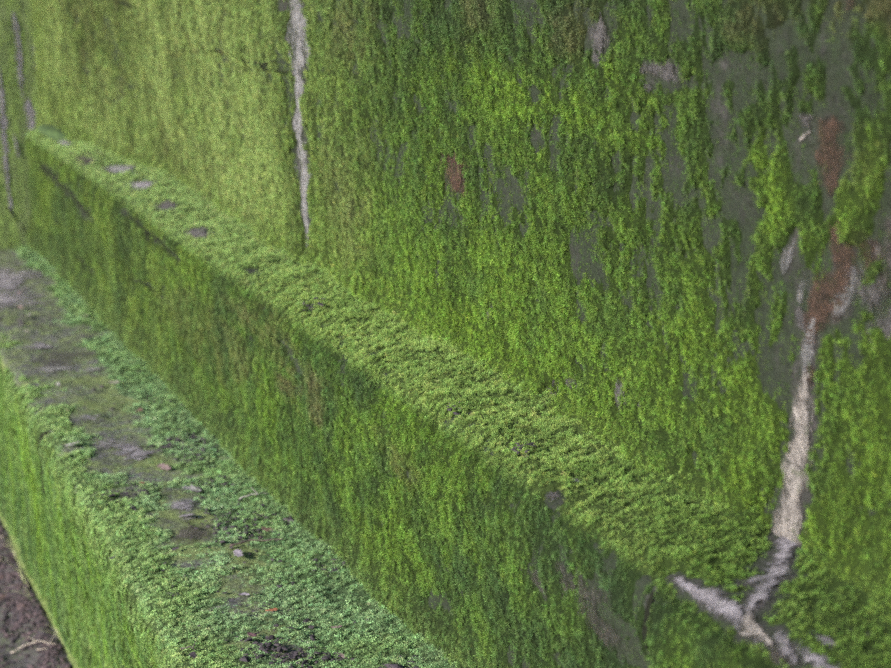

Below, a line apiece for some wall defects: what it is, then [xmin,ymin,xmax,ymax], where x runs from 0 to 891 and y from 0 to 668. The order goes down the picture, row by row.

rust [803,222,882,348]
crack [674,319,815,664]